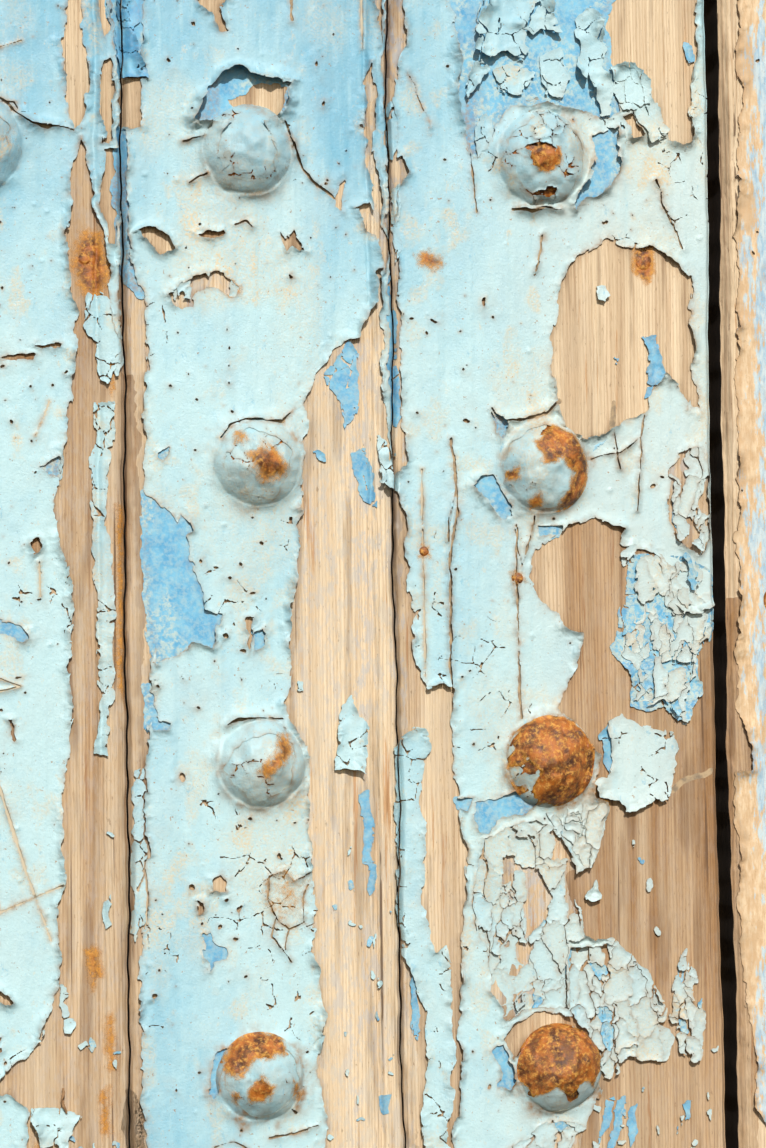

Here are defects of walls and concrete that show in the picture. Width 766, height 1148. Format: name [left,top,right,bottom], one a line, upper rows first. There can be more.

spalling [198,0,229,32]
peeling [195,65,291,120]
rust [531,143,562,171]
spalling [280,230,304,251]
rust [234,431,287,483]
rust [535,425,588,512]
peeling [0,0,225,1148]
peeling [284,0,766,1148]
spalling [245,616,266,651]
rust [508,715,595,806]
rust [223,1032,289,1102]
rust [517,1023,601,1096]